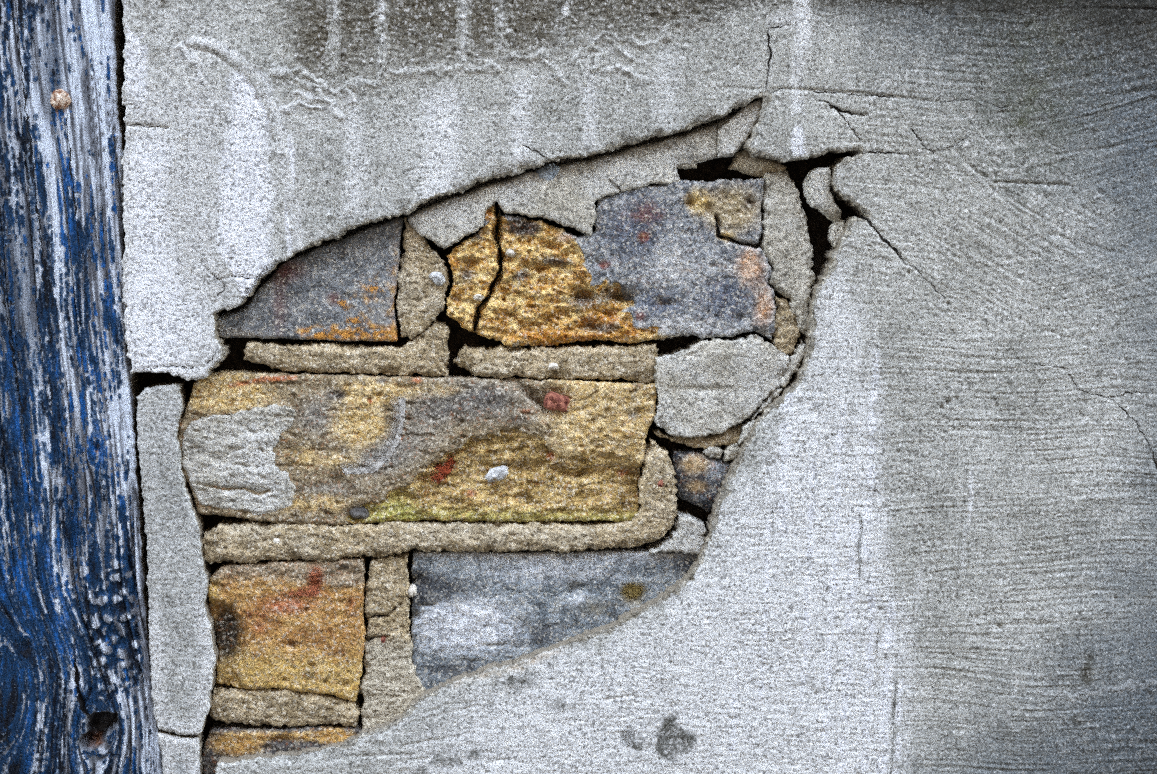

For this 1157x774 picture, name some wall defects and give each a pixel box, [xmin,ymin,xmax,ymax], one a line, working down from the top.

crack [764,14,1008,156]
crack [855,208,944,297]
flaking render [203,91,872,768]
crack [1012,355,1157,469]